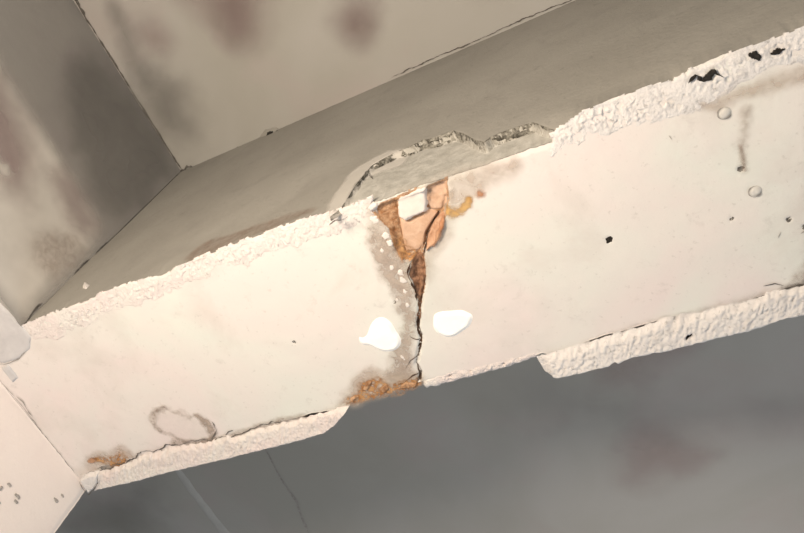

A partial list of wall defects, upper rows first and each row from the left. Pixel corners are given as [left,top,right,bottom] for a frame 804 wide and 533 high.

corrosion [446,191,484,217]
spalling [329,122,554,380]
crack [756,283,804,298]
crack [400,286,424,385]
corrosion [347,372,421,403]
damp [195,415,216,442]
corrosion [88,449,131,469]